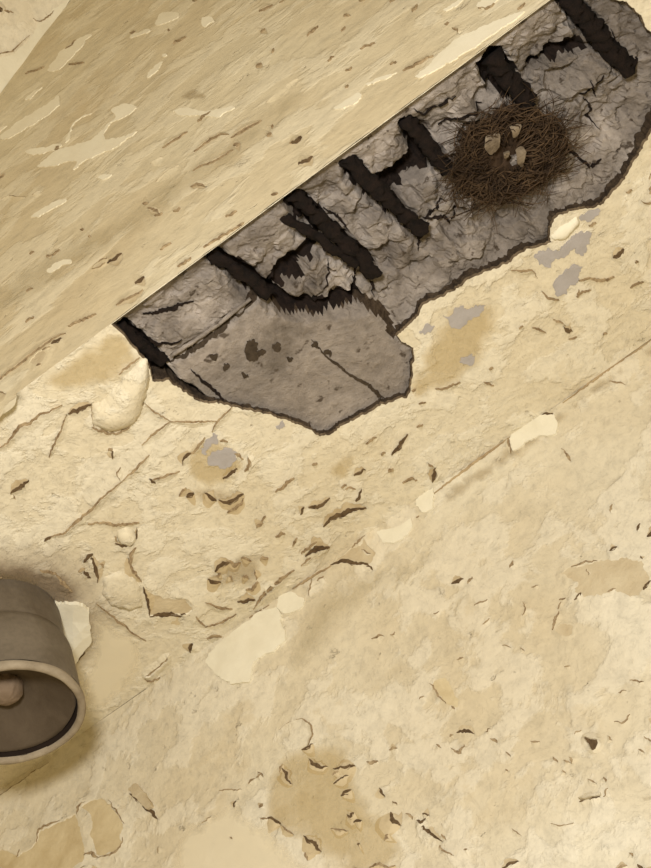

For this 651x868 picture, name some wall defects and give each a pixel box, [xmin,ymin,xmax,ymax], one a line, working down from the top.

peeling [25,103,137,170]
spalling [109,0,651,436]
crack [119,357,140,376]
crack [0,405,63,451]
crack [44,403,233,547]
peeling [177,433,259,515]
peeling [275,463,445,577]
peeling [38,569,98,664]
peeling [88,521,269,629]
peeling [182,576,327,685]
peeling [551,544,651,641]
peeling [0,783,158,868]